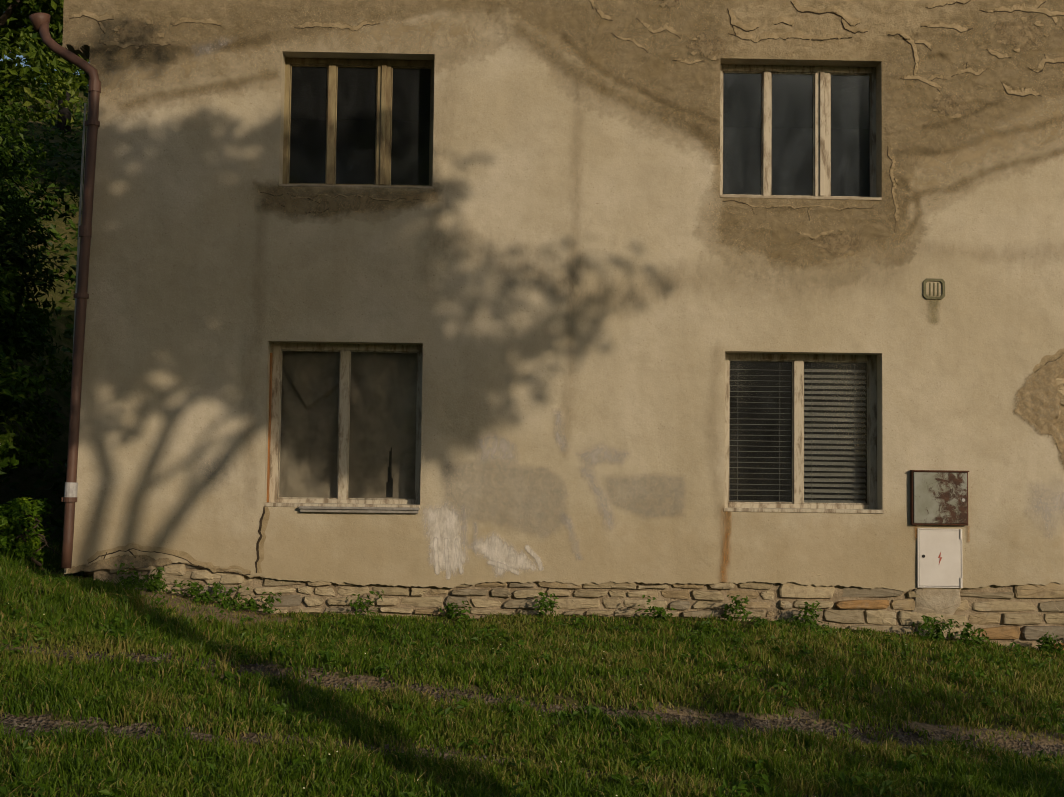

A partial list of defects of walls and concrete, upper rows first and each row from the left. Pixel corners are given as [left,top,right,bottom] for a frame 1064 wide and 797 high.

spalling [1015,352,1064,465]
crack [87,507,270,576]